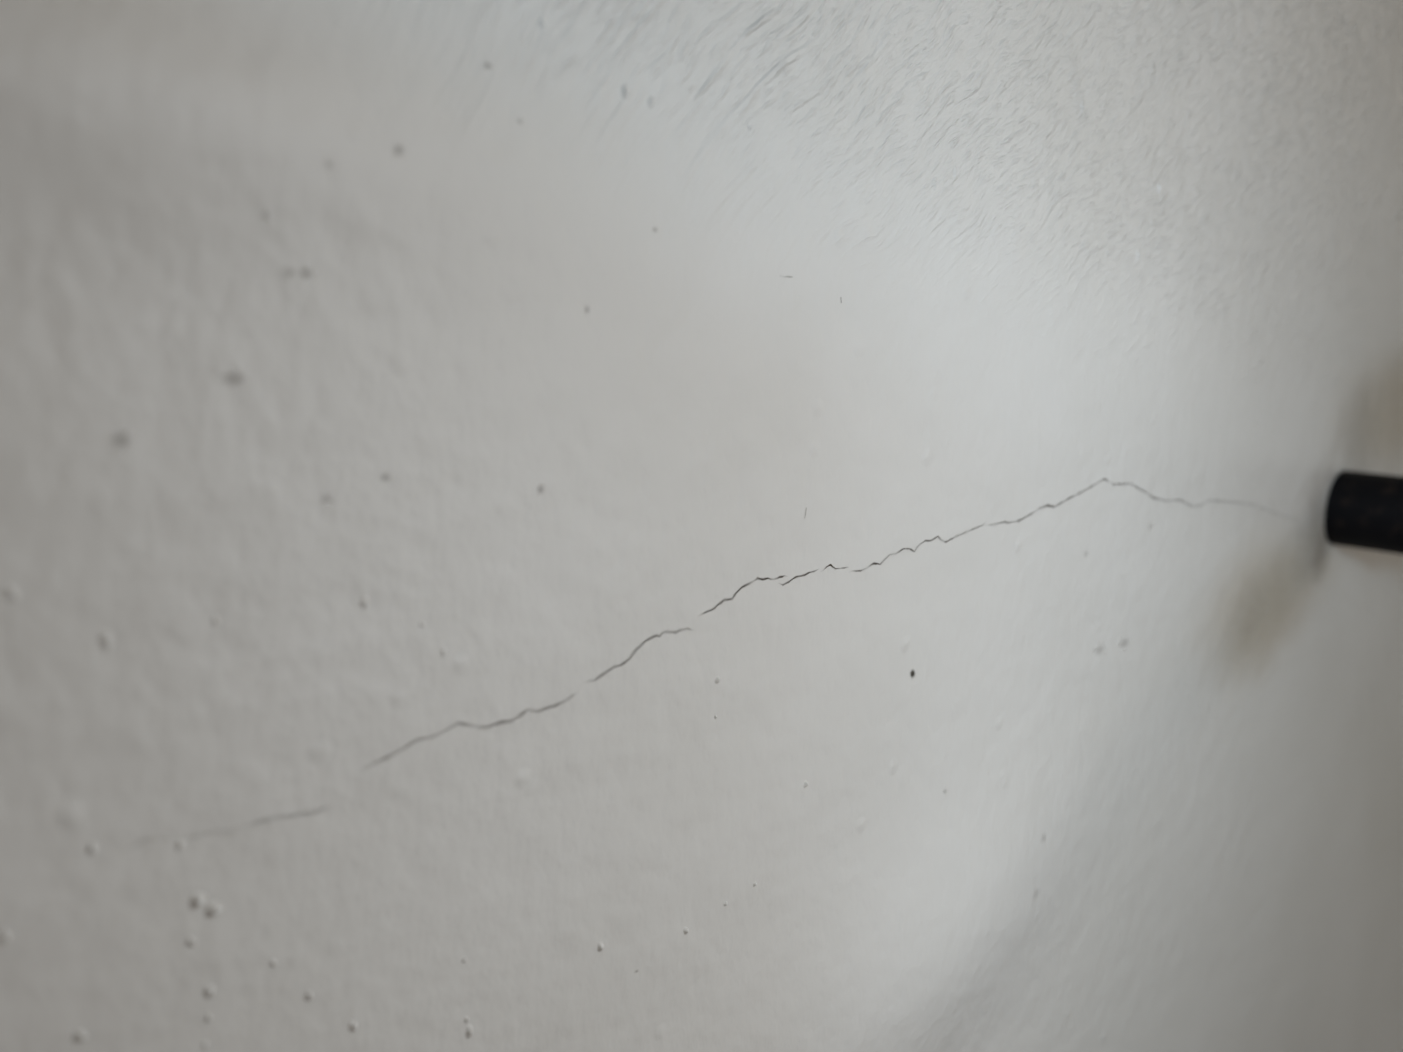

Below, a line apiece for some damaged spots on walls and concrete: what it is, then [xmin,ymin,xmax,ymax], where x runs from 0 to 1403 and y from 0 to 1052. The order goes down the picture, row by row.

crack [705,534,962,613]